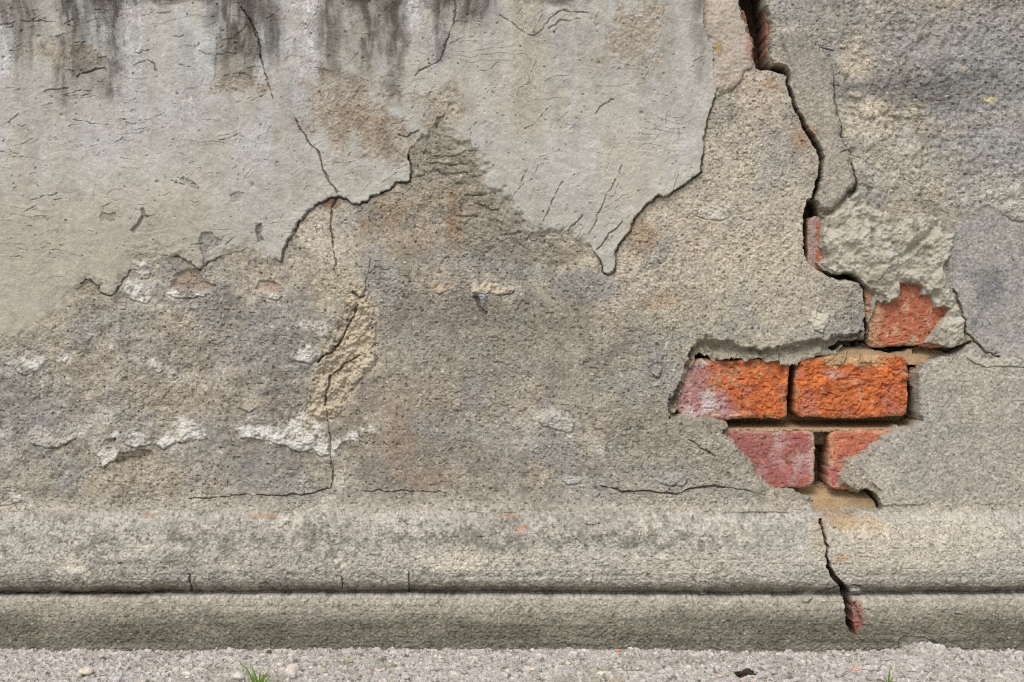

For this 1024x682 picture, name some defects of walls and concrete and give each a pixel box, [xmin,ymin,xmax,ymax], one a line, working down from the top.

water stain [61,0,97,25]
water stain [110,0,175,133]
water stain [220,0,279,54]
water stain [298,0,337,106]
water stain [353,0,449,65]
water stain [462,0,489,18]
crack [738,0,1001,358]
crack [188,7,390,500]
peeling [595,74,1024,517]
crack [600,485,767,496]
crack [863,489,883,510]
crack [817,518,865,602]